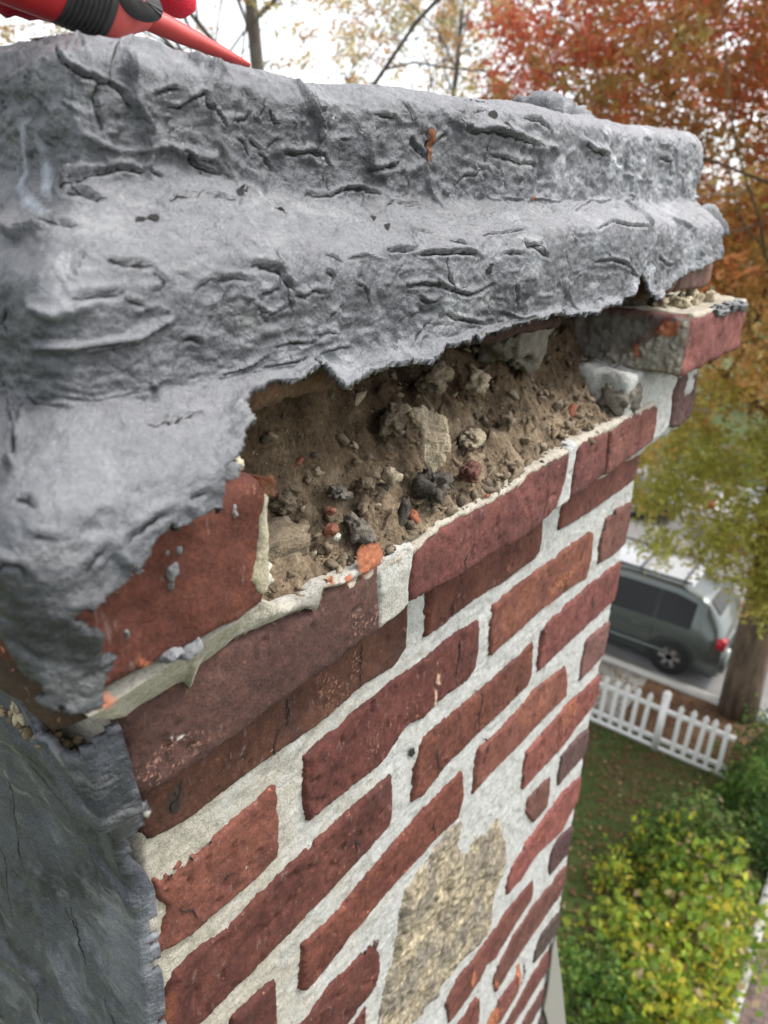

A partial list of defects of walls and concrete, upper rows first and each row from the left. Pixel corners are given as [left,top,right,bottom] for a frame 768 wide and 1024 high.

crack [29,35,132,130]
crack [153,88,549,207]
rust [426,128,437,162]
crack [59,149,222,202]
crack [576,190,645,229]
crack [72,258,165,306]
crack [197,227,546,376]
crack [63,342,125,355]
peeling [406,405,452,473]
spalling [324,542,384,585]
peeling [139,637,203,667]
spalling [101,694,117,709]